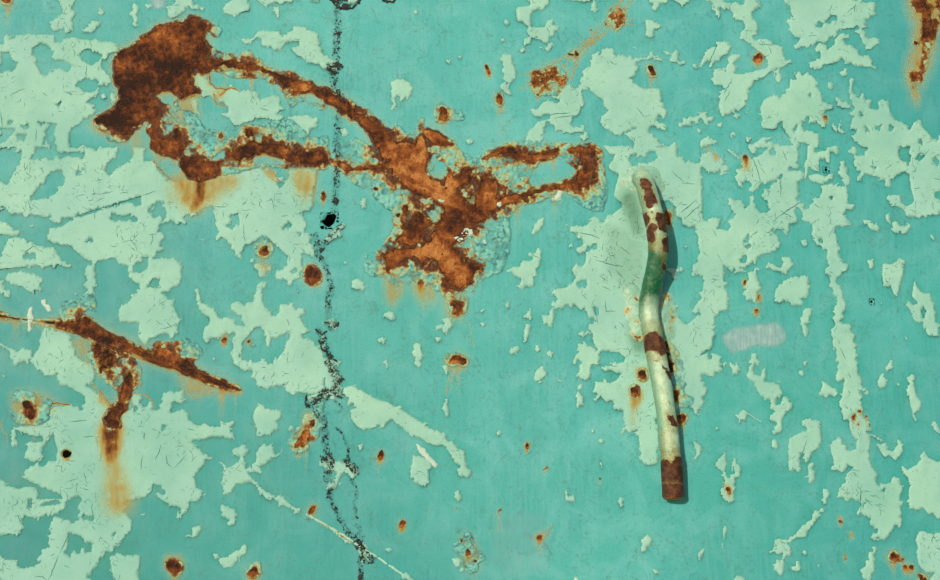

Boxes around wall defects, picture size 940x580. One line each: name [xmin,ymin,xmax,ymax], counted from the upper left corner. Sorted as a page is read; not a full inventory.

corrosion [0,294,242,511]
peeling [0,0,472,580]
corrosion [93,14,608,318]
peeling [500,0,940,580]
corrosion [909,0,940,95]